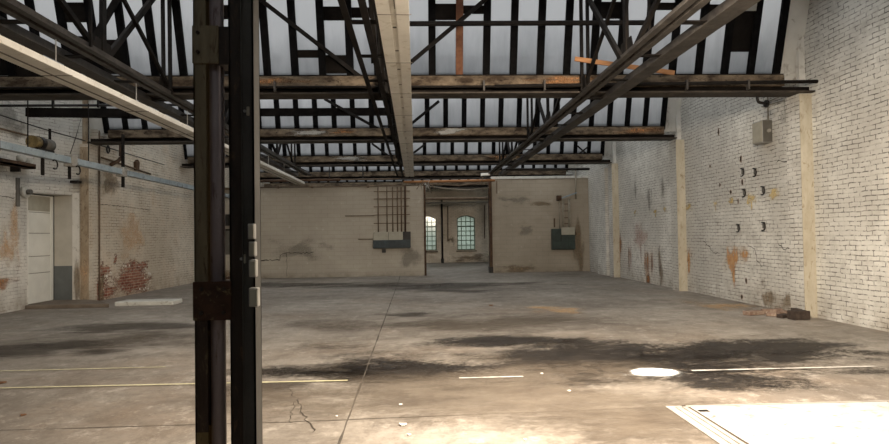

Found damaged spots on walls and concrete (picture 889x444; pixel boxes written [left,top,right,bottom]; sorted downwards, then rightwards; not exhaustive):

peeling [96,254,152,300]
crack [288,386,316,433]
leakage [262,362,725,442]